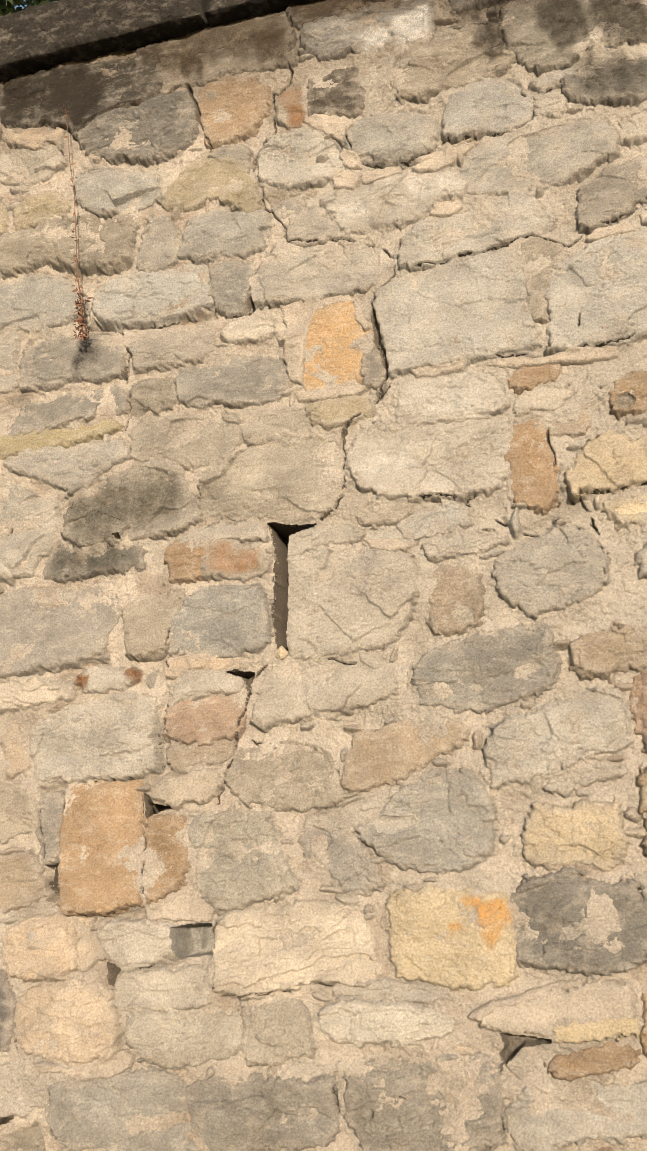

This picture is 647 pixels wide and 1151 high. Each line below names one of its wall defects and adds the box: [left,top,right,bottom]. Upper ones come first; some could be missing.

crack [272,17,294,134]
crack [345,89,552,169]
crack [233,156,581,521]
crack [578,316,633,347]